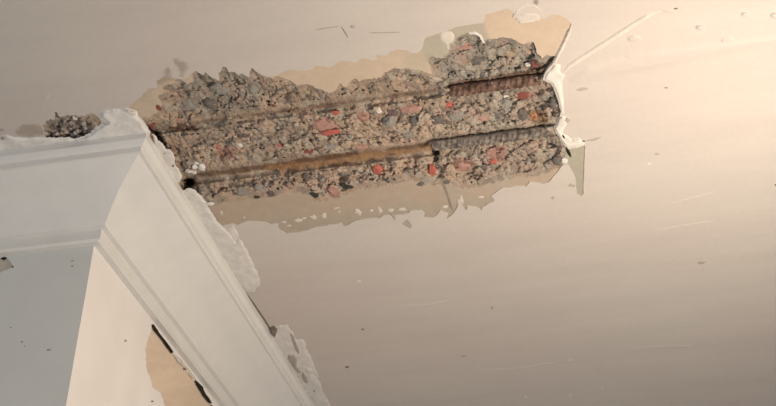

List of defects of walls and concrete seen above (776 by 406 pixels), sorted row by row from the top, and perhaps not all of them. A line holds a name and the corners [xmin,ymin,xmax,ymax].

rust [449,63,546,85]
flaking render [43,112,101,139]
spalling [129,9,585,241]
rust [199,144,429,176]
peeling [145,327,211,406]